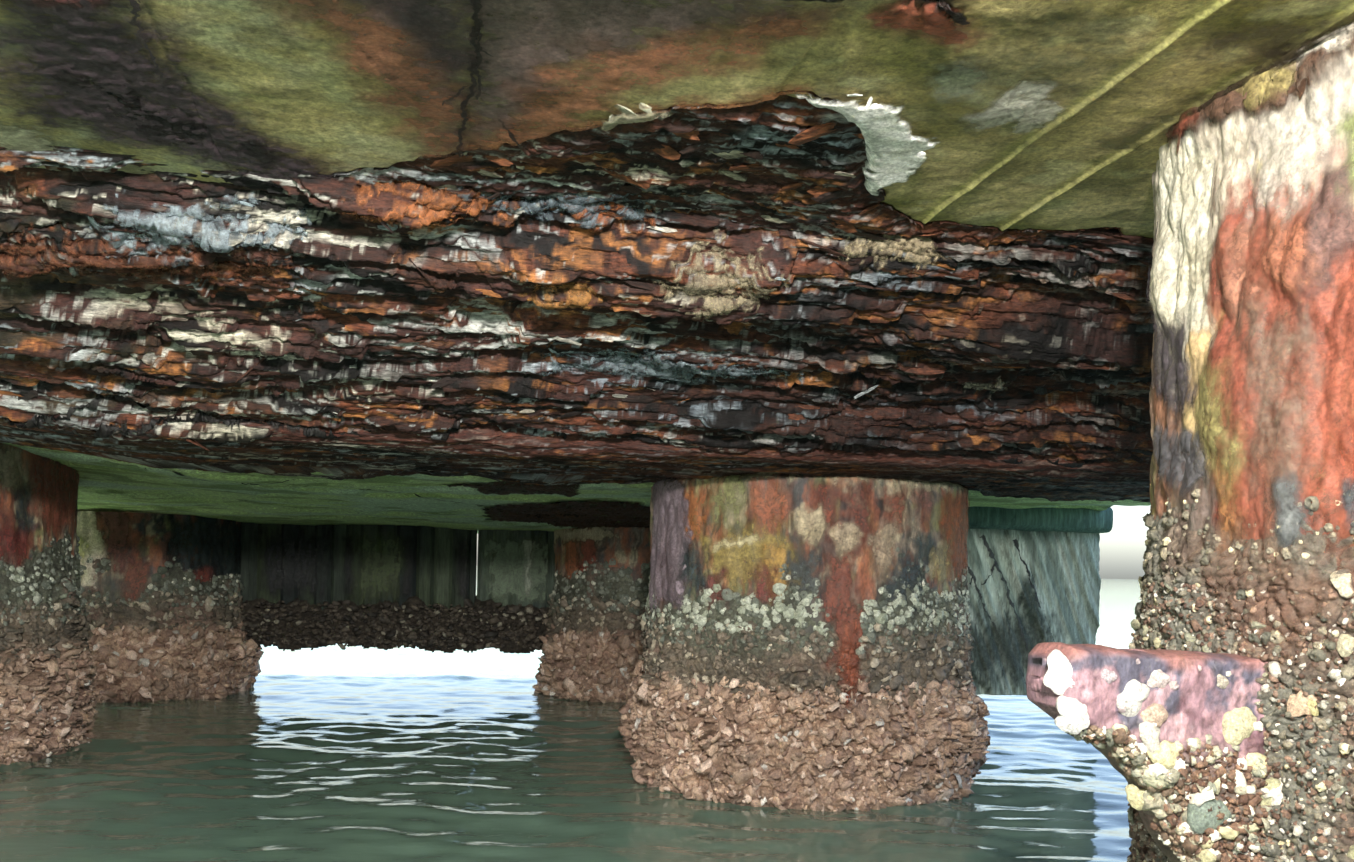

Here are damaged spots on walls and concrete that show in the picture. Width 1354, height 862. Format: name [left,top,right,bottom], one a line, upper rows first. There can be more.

crack [922,0,969,25]
crack [442,0,529,157]
spalling [0,0,1123,253]
corrosion [0,214,313,291]
corrosion [342,175,520,227]
corrosion [556,198,663,235]
corrosion [519,275,604,310]
corrosion [1204,172,1354,642]
corrosion [27,456,78,532]
corrosion [684,482,801,609]